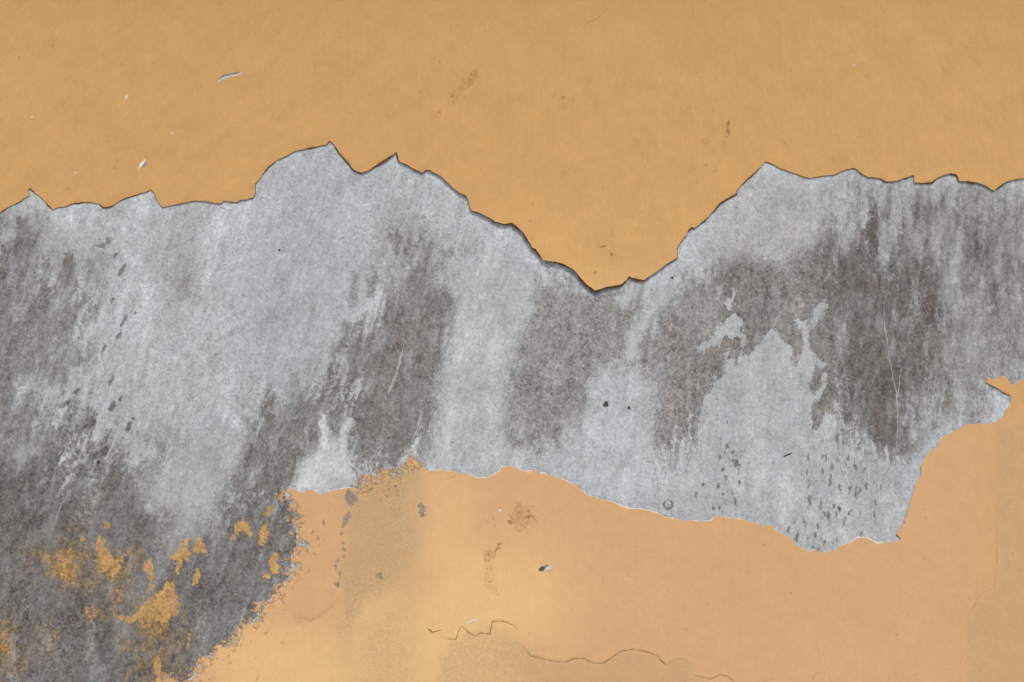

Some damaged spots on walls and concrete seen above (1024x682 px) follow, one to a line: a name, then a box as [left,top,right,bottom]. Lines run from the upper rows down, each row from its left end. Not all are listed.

damp [0,236,456,682]
peeling [0,141,1024,682]
damp [501,262,643,460]
damp [642,226,956,456]
crack [427,613,738,682]